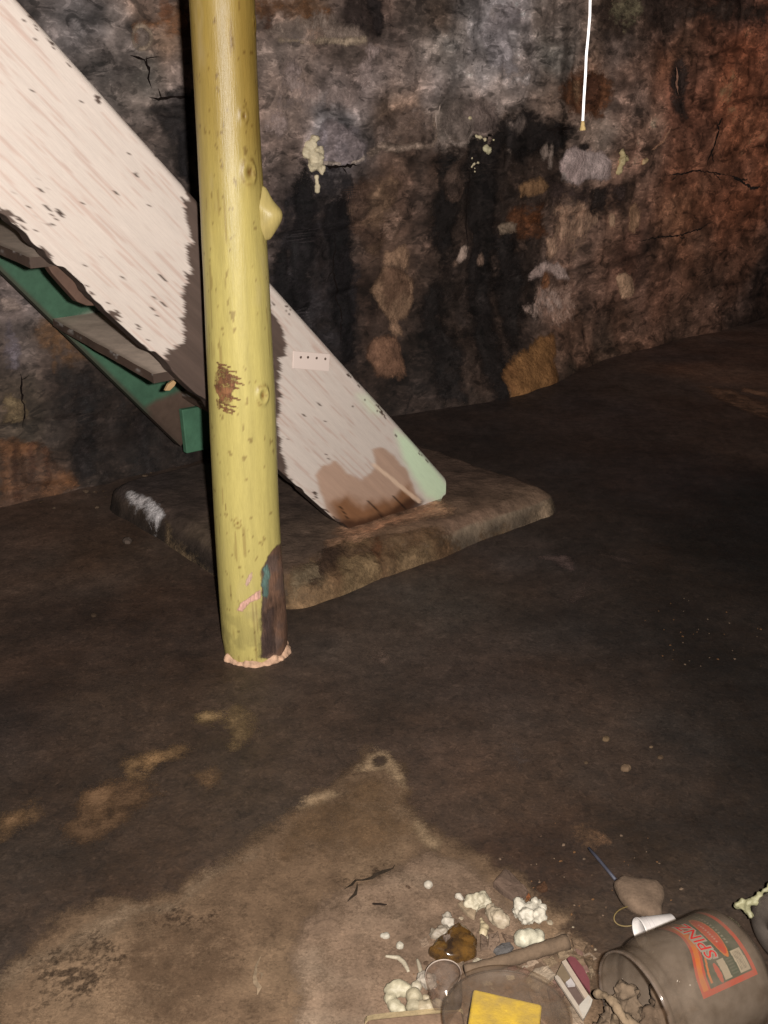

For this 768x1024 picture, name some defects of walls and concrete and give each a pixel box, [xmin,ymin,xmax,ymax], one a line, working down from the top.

crack [130,55,194,101]
crack [668,118,761,190]
damp [269,161,360,369]
damp [419,106,640,408]
crack [639,221,713,241]
spalling [261,526,459,659]